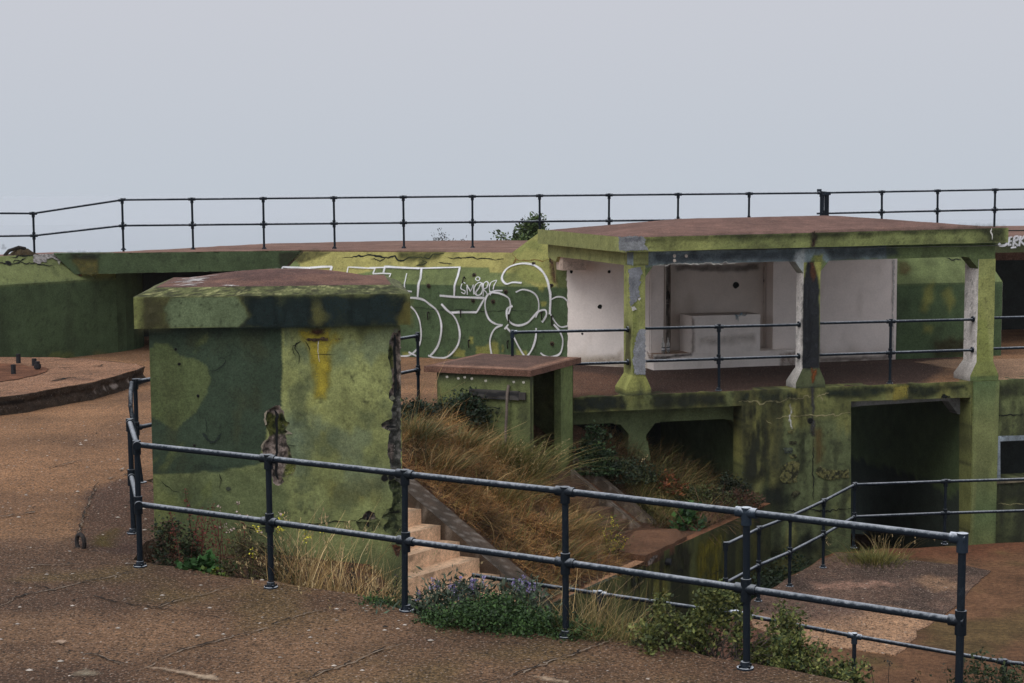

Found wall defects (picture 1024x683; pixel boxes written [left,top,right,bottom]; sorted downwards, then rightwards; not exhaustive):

crack [344,253,551,269]
peeling [628,267,643,311]
peeling [632,329,646,375]
spalling [261,405,296,486]
spalling [356,329,402,557]
crack [739,393,851,512]